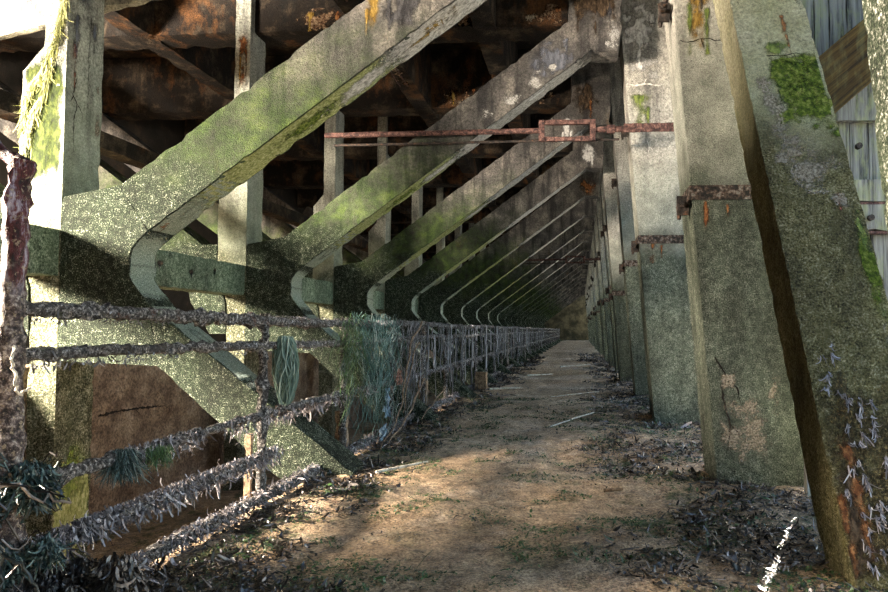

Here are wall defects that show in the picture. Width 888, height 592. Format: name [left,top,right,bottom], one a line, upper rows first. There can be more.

crack [715,357,741,450]
corrosion [836,430,880,580]